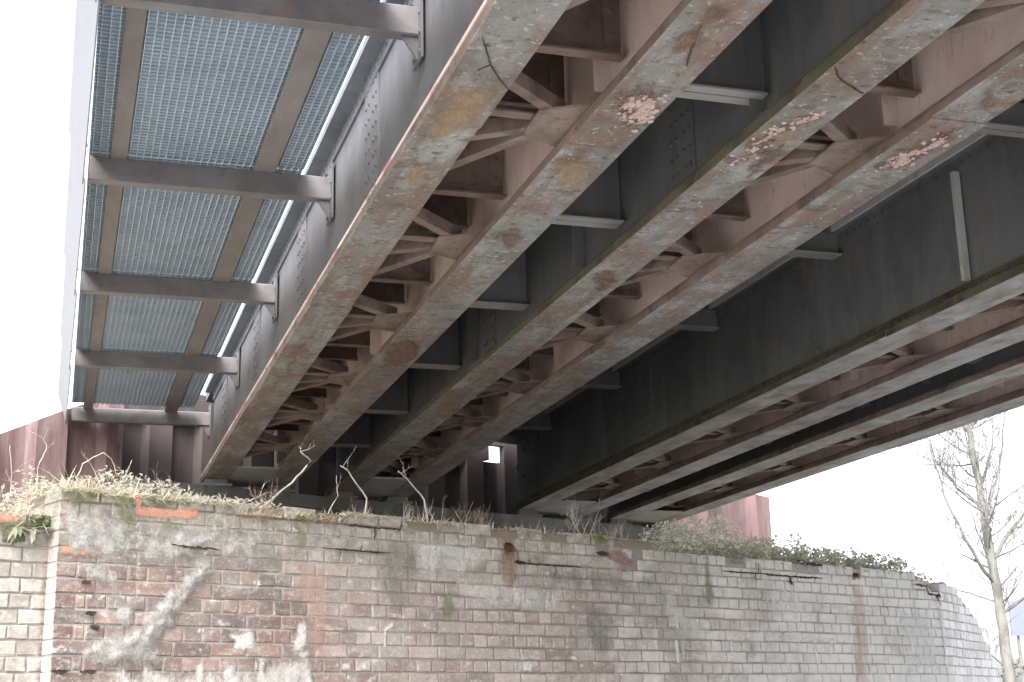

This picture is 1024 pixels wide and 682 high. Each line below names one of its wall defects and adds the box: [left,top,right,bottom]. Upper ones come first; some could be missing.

crack [835,66,863,94]
peeling [612,89,668,133]
peeling [728,111,827,166]
peeling [874,131,961,172]
crack [322,521,402,555]
crack [525,559,581,577]
crack [722,564,823,585]
crack [913,583,941,605]